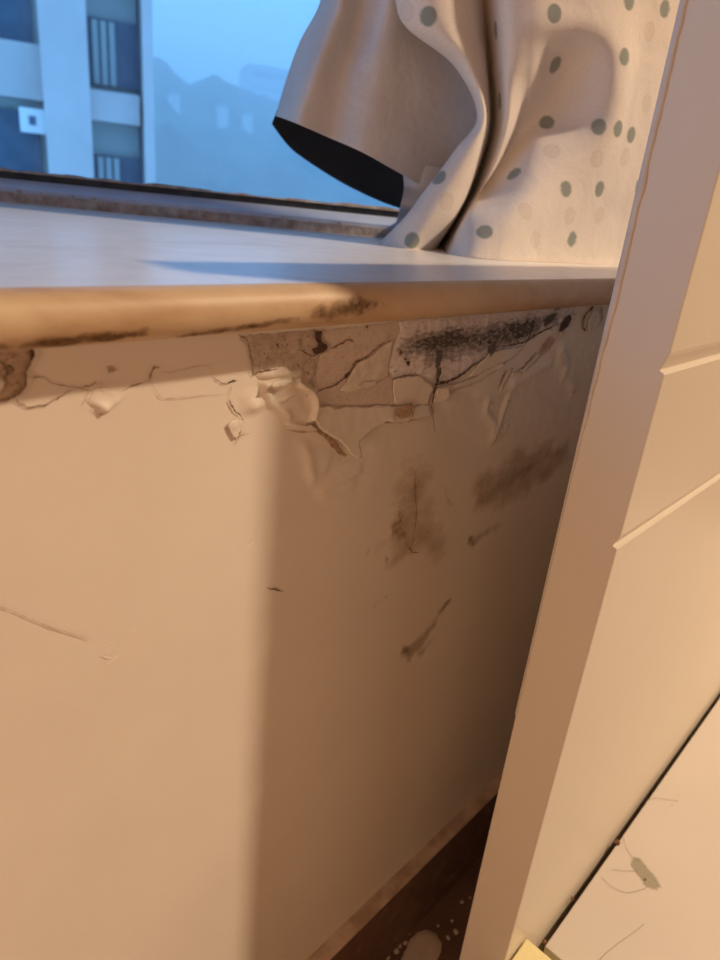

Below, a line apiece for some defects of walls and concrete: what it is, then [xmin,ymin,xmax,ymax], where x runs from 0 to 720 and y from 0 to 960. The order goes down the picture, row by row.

spalling [0,349,35,402]
crack [16,366,97,409]
crack [122,365,235,399]
spalling [227,306,603,459]
crack [431,367,441,430]
water stain [406,313,557,380]
crack [497,353,542,393]